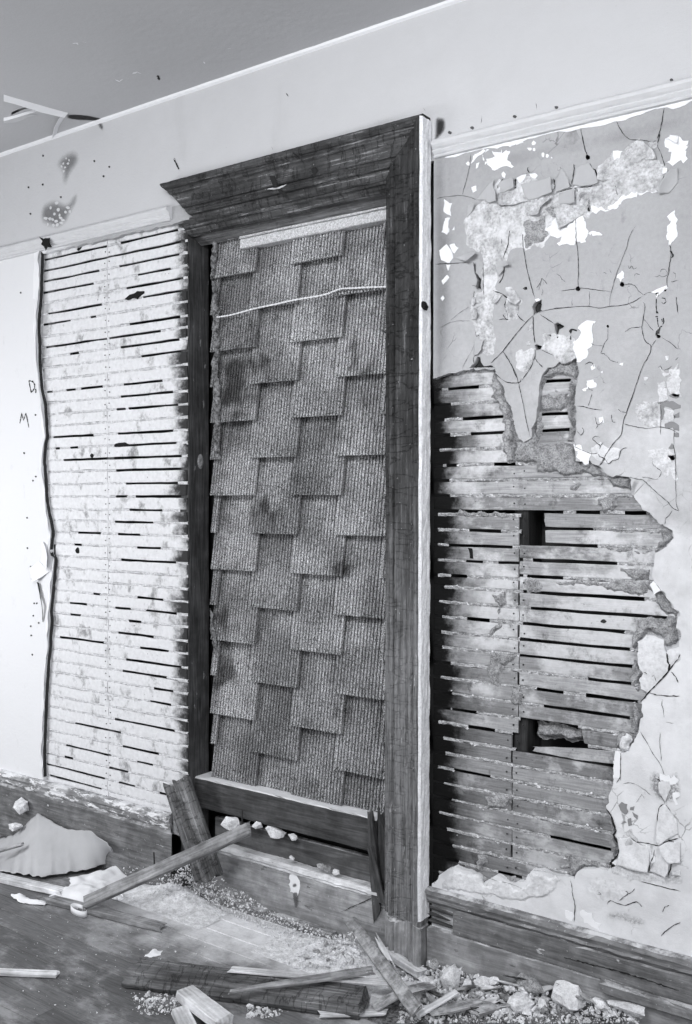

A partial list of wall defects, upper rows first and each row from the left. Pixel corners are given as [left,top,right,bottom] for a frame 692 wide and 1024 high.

damp [61,157,75,172]
crack [616,111,665,178]
damp [44,202,71,227]
spalling [67,246,107,288]
spalling [124,229,181,298]
spalling [132,316,181,357]
crack [440,133,678,520]
spalling [132,380,178,409]
spalling [132,430,181,564]
peeling [429,99,692,886]
spalling [132,596,181,706]
crack [599,653,680,936]